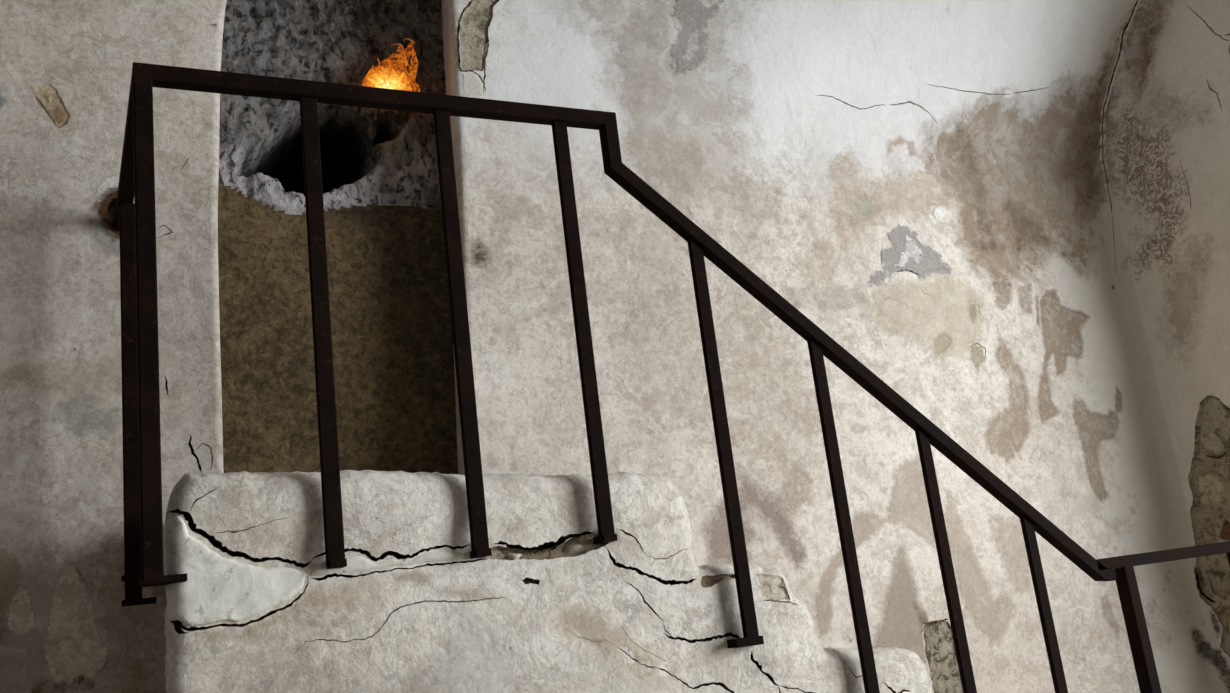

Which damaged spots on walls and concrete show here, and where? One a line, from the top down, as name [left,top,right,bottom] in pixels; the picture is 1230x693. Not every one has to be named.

spalling [457,0,499,94]
spalling [34,84,70,128]
crack [815,84,1049,123]
water stain [831,0,1187,285]
crack [1102,0,1138,276]
corrosion [94,177,120,253]
peeling [867,225,952,287]
water stain [986,290,1088,458]
water stain [1074,390,1122,501]
crack [166,435,815,693]
spalling [1188,395,1230,658]
crack [847,666,910,693]